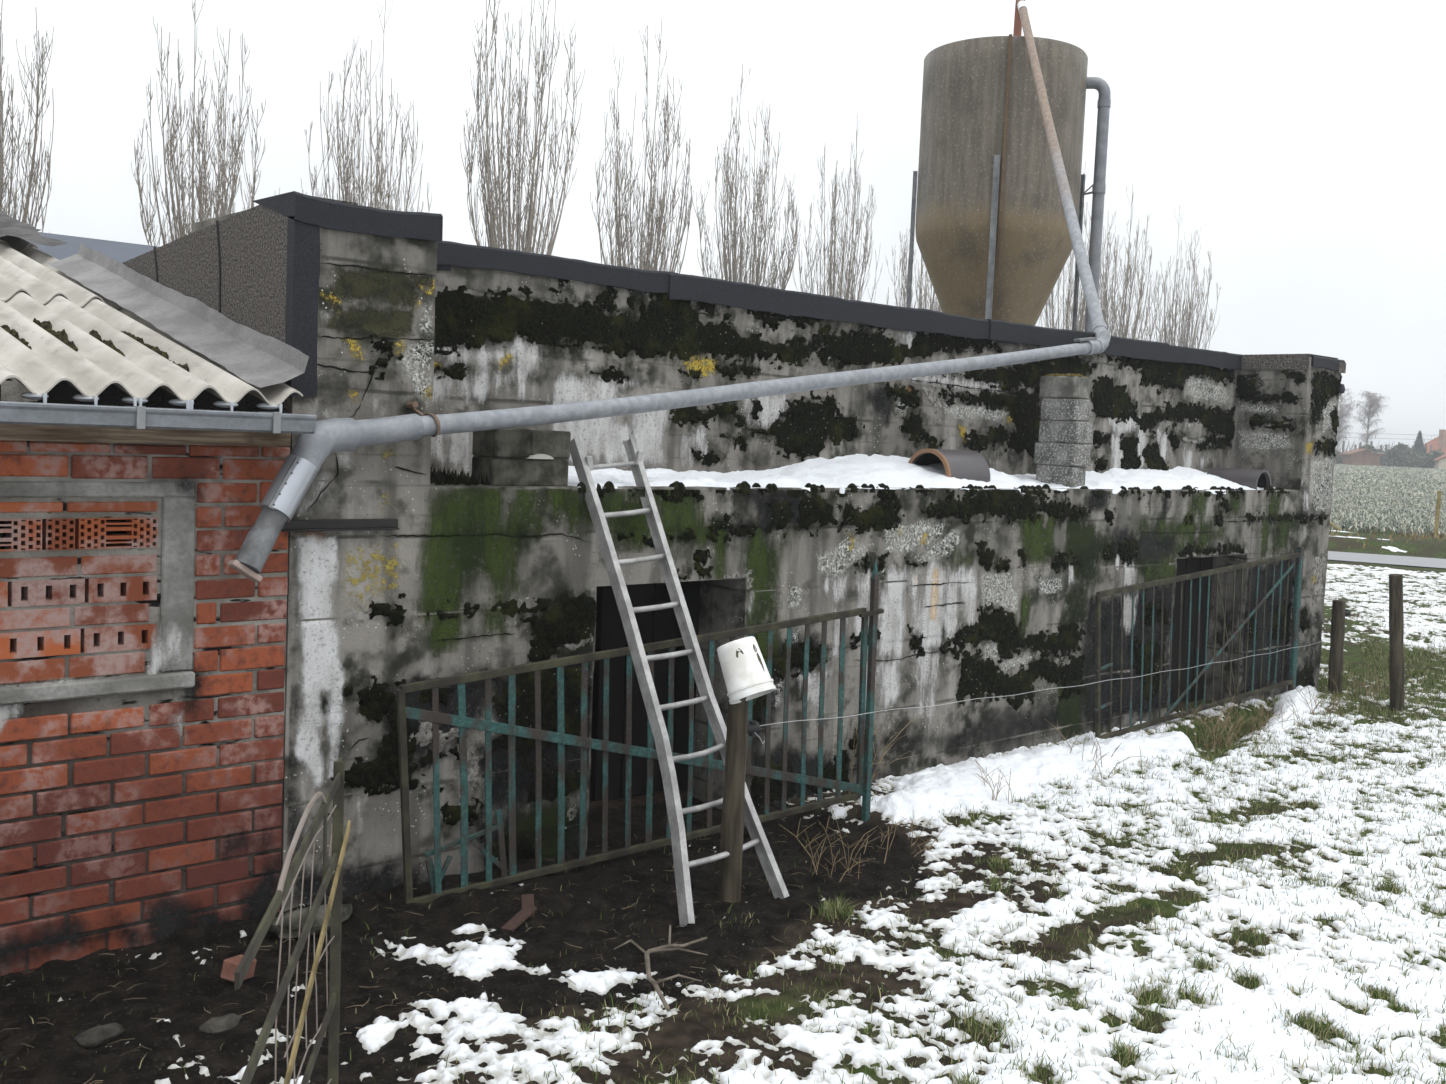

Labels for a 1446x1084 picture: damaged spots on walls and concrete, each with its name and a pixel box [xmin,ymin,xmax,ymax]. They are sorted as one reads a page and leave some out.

leakage [432,339,538,402]
leakage [288,535,345,786]
leakage [753,561,1067,752]
leakage [745,743,831,807]